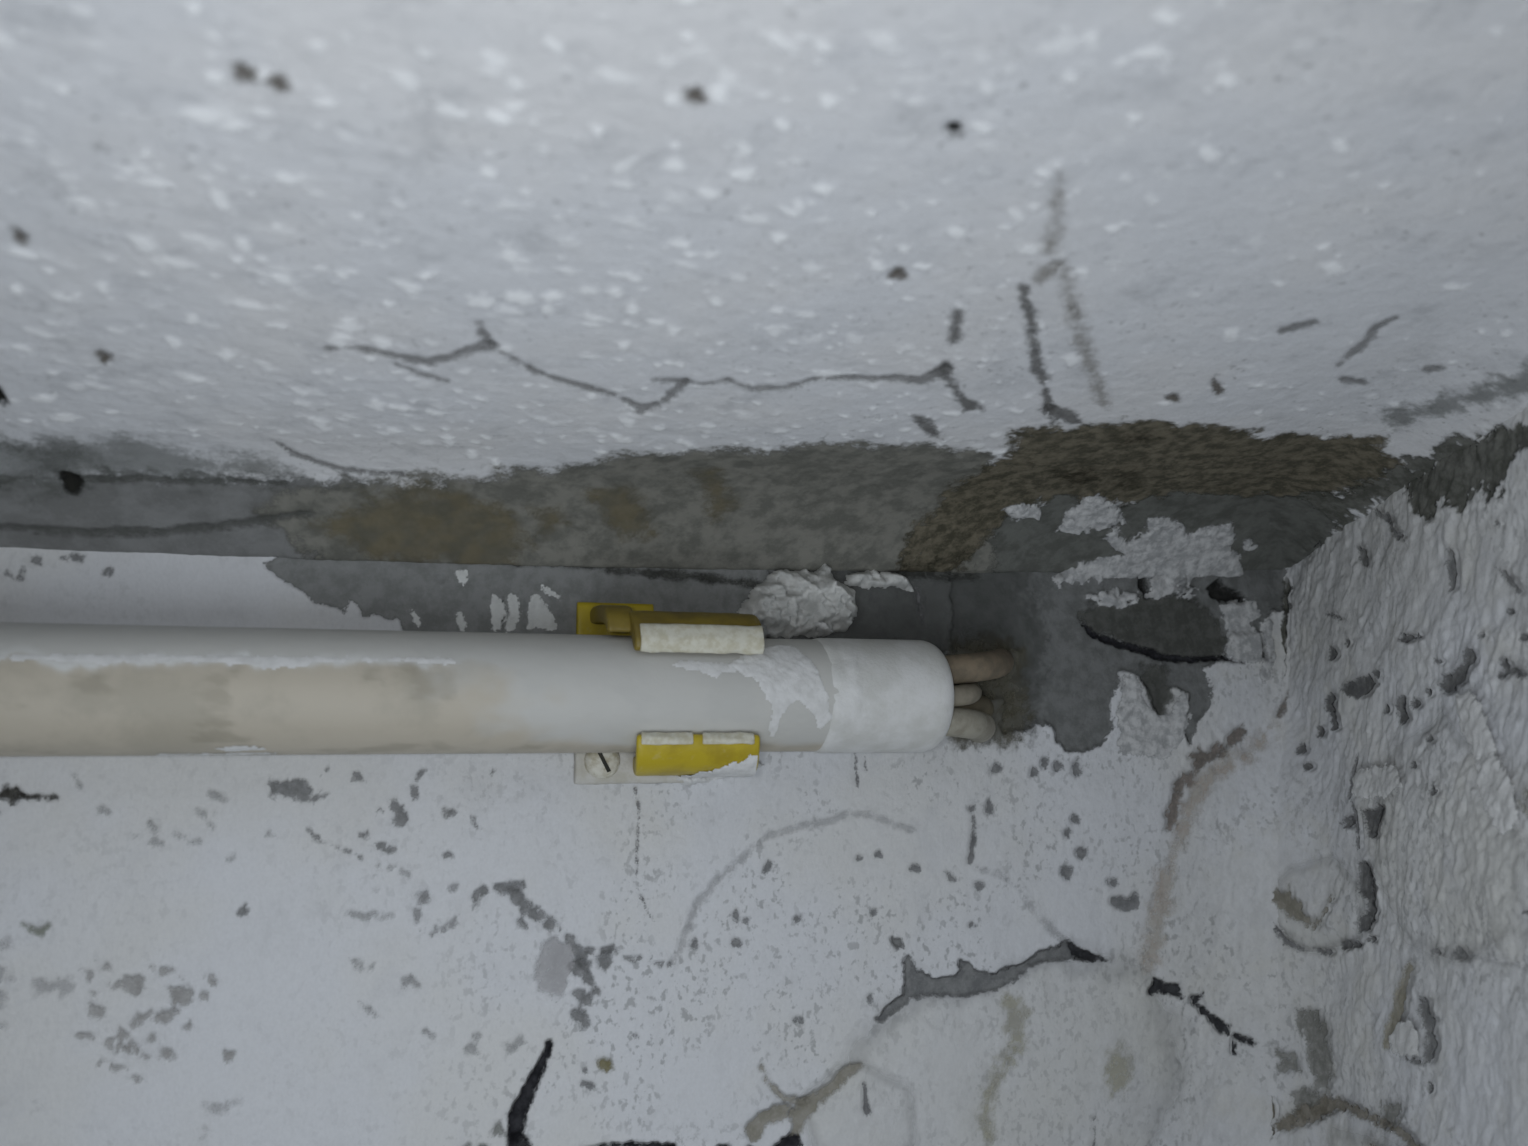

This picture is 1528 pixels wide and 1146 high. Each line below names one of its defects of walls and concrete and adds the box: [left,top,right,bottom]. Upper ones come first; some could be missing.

crack [325,322,953,414]
leakage [0,286,1528,573]
peeling [263,557,791,634]
peeling [765,567,1293,777]
peeling [1296,670,1380,771]
peeling [1385,633,1520,835]
peeling [268,779,328,802]
peeling [377,770,425,827]
peeling [34,964,216,1083]
crack [472,881,675,1146]
crack [1148,978,1256,1055]
crack [719,1064,872,1146]